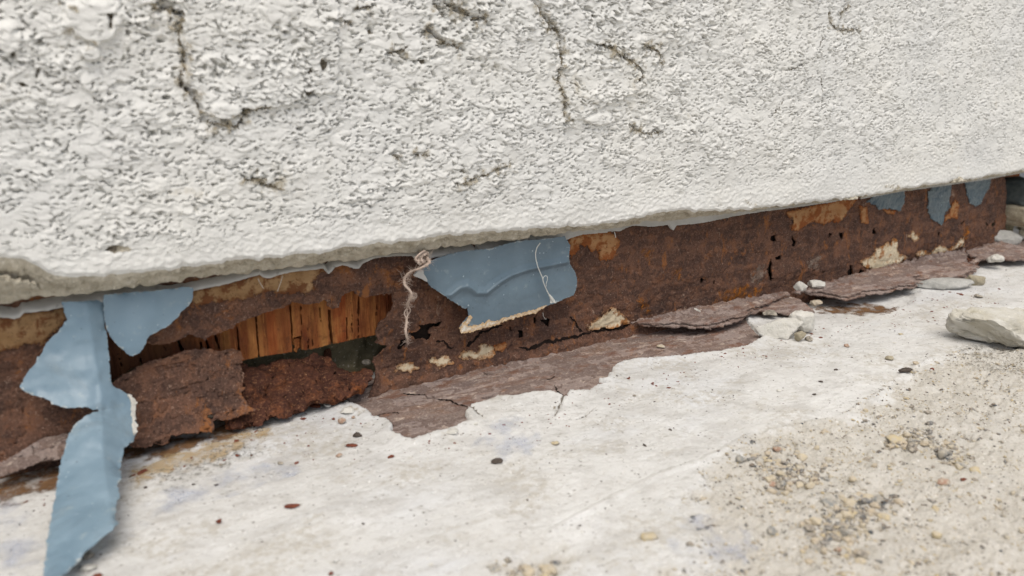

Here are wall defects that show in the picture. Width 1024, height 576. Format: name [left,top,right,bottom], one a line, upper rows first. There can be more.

crack [153,3,277,135]
crack [534,3,574,122]
crack [596,41,665,78]
crack [242,175,282,190]
rust [815,302,896,316]
peeling [0,198,842,576]